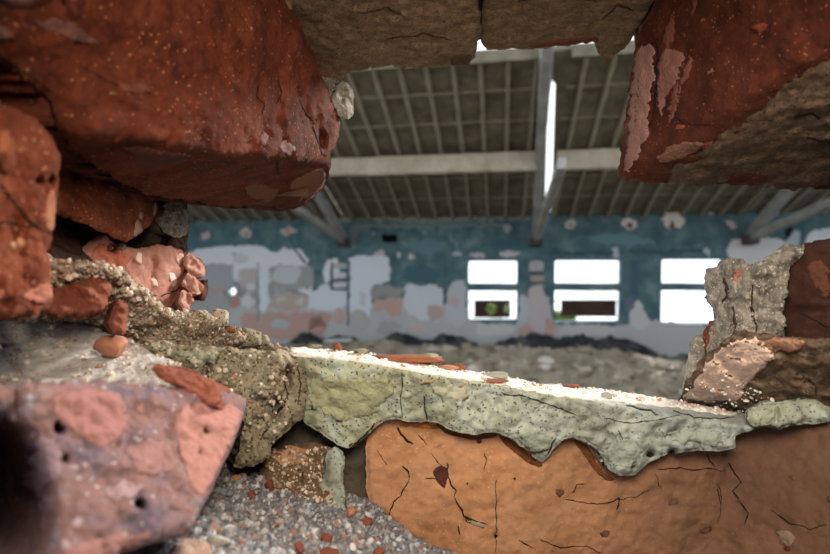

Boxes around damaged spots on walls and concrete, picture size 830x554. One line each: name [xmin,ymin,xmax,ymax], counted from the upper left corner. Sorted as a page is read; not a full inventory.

spalling [0,0,715,358]